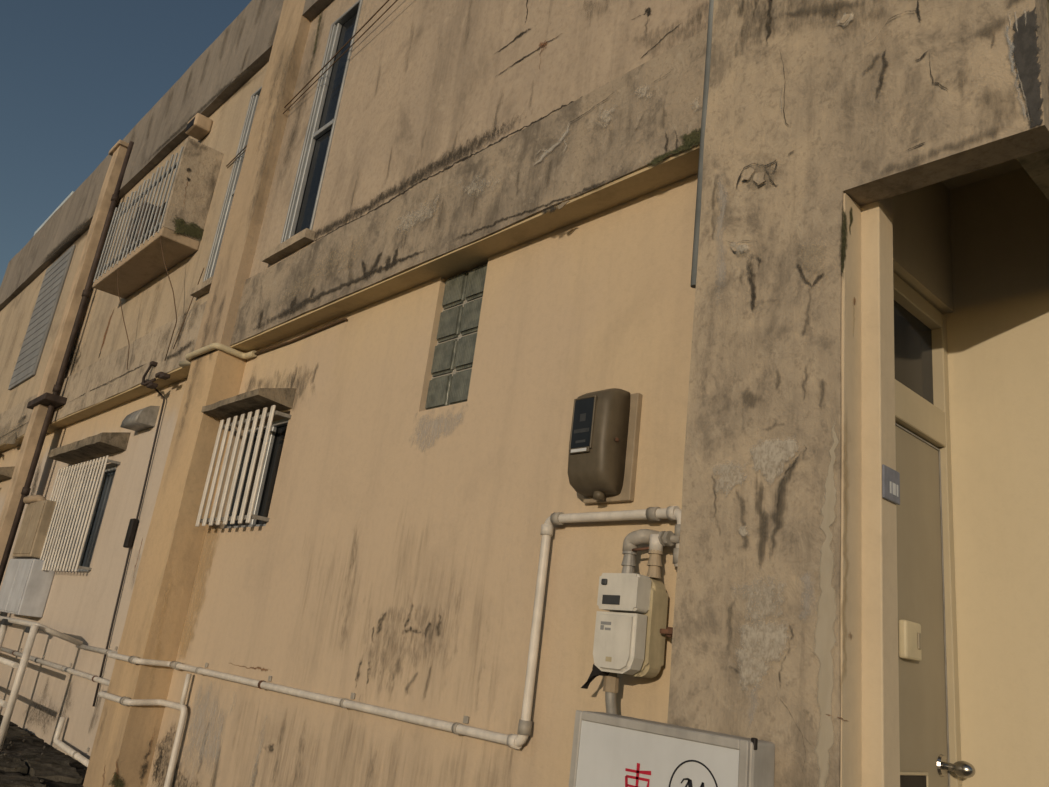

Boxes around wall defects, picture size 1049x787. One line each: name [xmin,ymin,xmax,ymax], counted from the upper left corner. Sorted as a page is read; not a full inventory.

crack [497,0,558,73]
crack [915,52,948,90]
peeling [1007,7,1043,127]
crack [300,93,613,249]
water stain [255,248,424,329]
peeling [737,580,794,687]